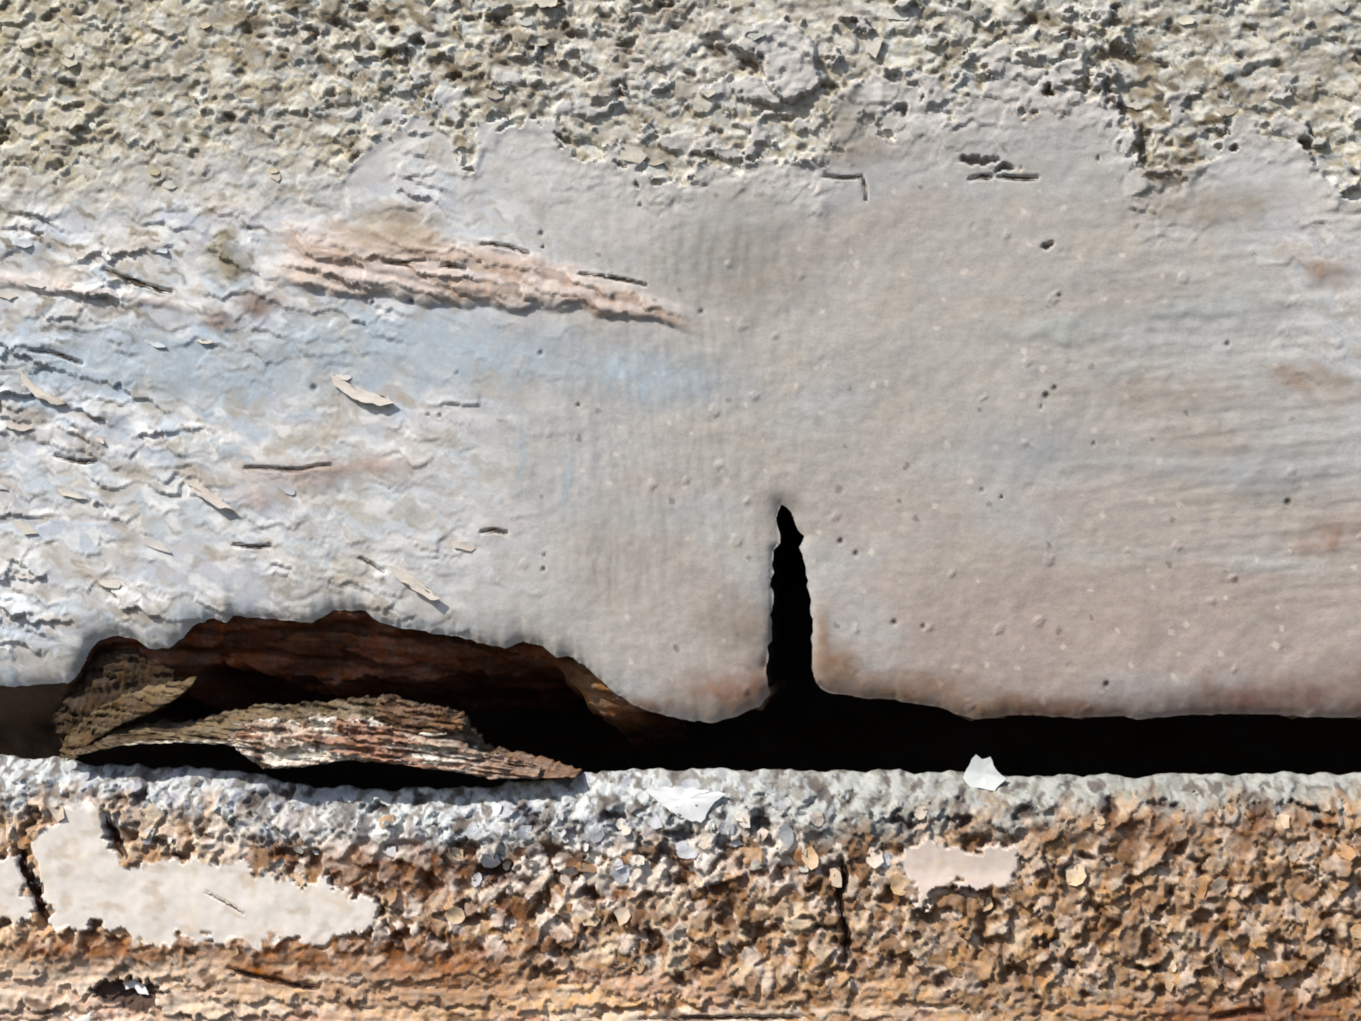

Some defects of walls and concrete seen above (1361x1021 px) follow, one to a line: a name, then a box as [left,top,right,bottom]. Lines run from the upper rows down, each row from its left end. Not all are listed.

peeling [0,0,1361,780]
crack [0,505,1361,791]
peeling [0,755,1361,1021]